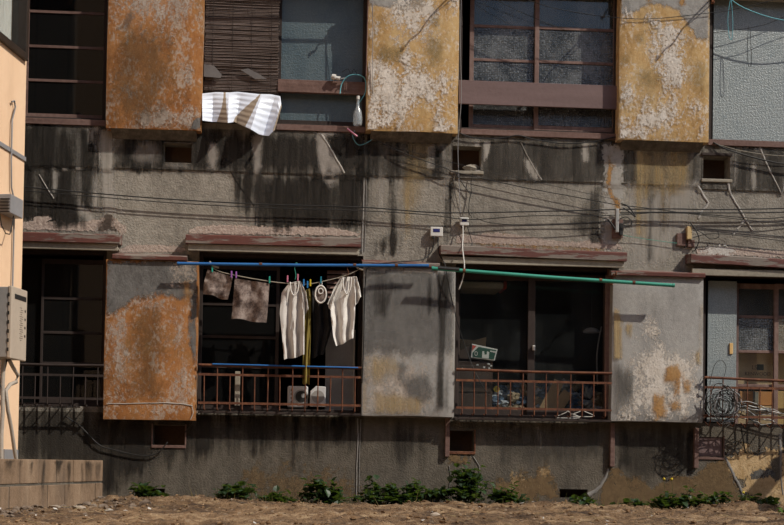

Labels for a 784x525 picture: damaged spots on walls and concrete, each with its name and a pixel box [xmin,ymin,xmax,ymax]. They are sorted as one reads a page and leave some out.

peeling [367,0,457,132]
damp [621,0,709,39]
damp [23,124,443,237]
damp [382,205,397,255]
damp [444,137,698,264]
peeling [601,13,707,251]
damp [106,244,197,364]
damp [364,268,455,408]
peeling [617,315,702,421]
peeling [599,443,784,507]